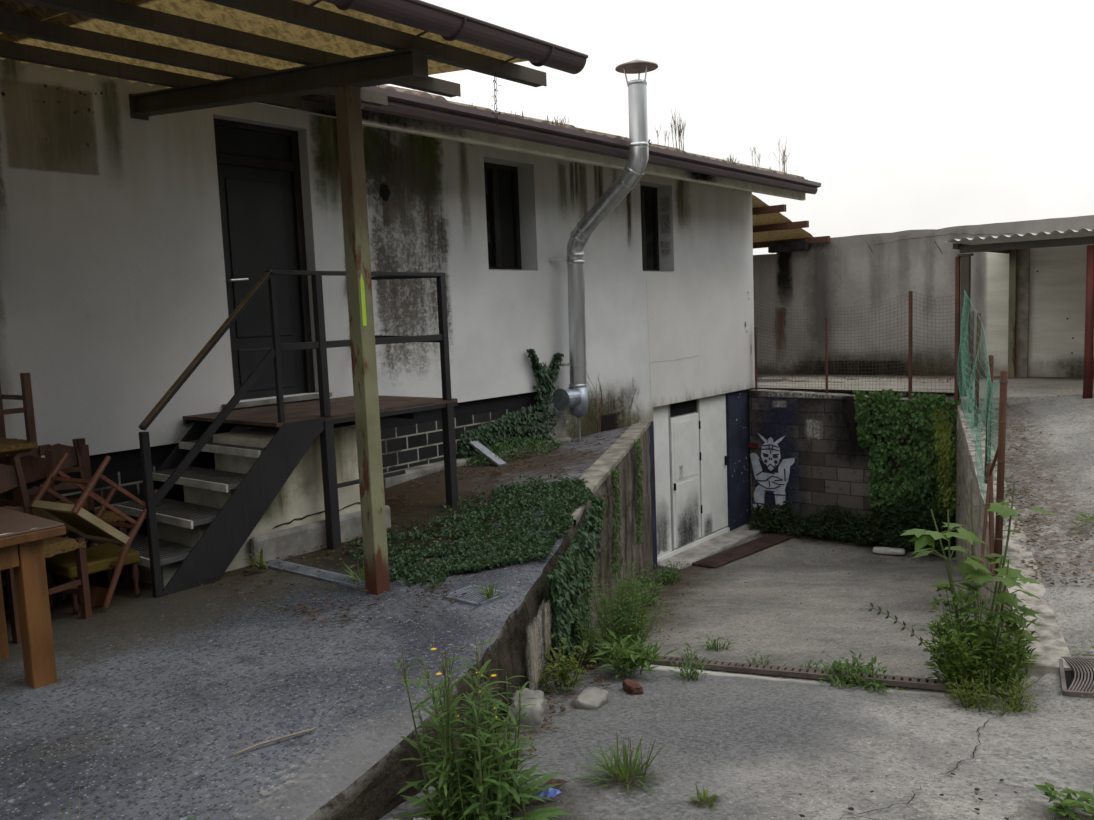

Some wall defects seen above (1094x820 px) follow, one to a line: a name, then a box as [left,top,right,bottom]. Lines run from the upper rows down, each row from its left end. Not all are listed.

damp [312,110,339,178]
damp [560,162,603,213]
damp [678,171,713,217]
damp [361,110,461,367]
damp [777,252,793,300]
crack [839,711,1012,820]